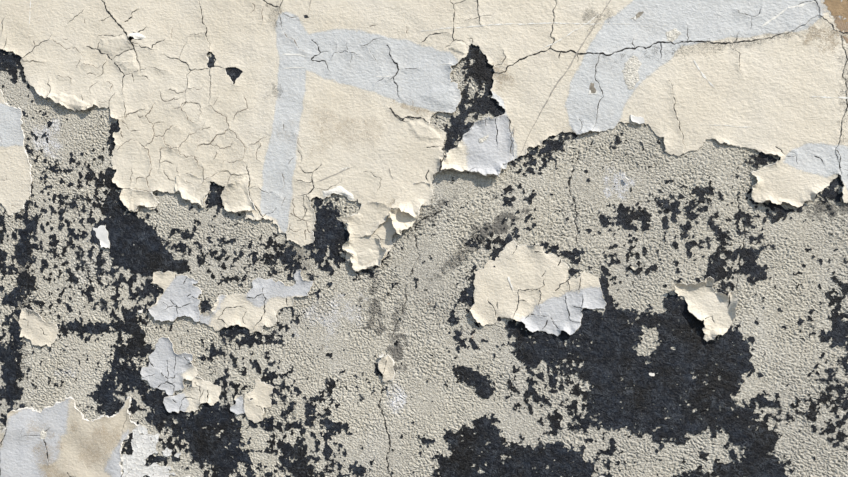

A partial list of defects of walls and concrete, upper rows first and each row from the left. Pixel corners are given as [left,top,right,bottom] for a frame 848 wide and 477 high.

crack [22,1,342,240]
peeling [0,0,848,276]
crack [495,0,848,176]
peeling [0,89,337,440]
peeling [454,239,607,346]
peeling [674,274,747,342]
peeling [0,377,192,477]
peeling [377,354,397,383]
peeling [817,356,848,451]